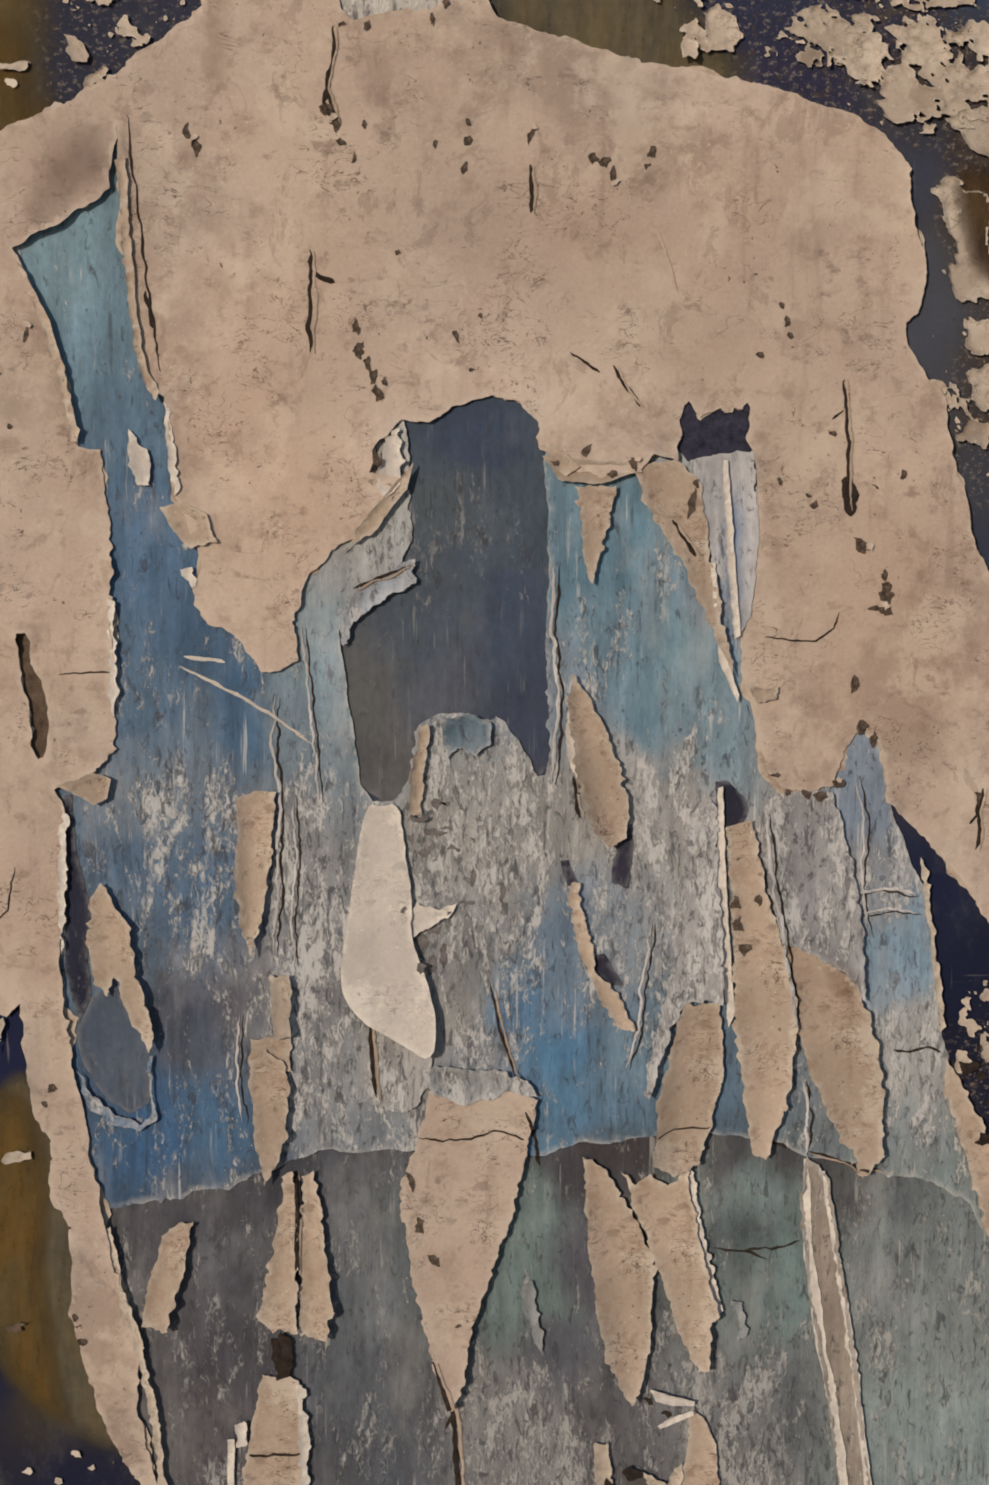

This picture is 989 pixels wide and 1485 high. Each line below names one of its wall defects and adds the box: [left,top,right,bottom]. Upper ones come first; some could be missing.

damp [0,0,45,131]
damp [489,0,736,78]
peeling [680,0,743,59]
peeling [777,0,989,157]
peeling [931,176,989,303]
crack [0,868,15,918]
peeling [341,804,538,1412]
peeling [920,858,989,1235]
damp [0,1076,116,1447]
peeling [141,1222,193,1333]
peeling [227,975,335,1485]
peeling [799,1157,872,1485]